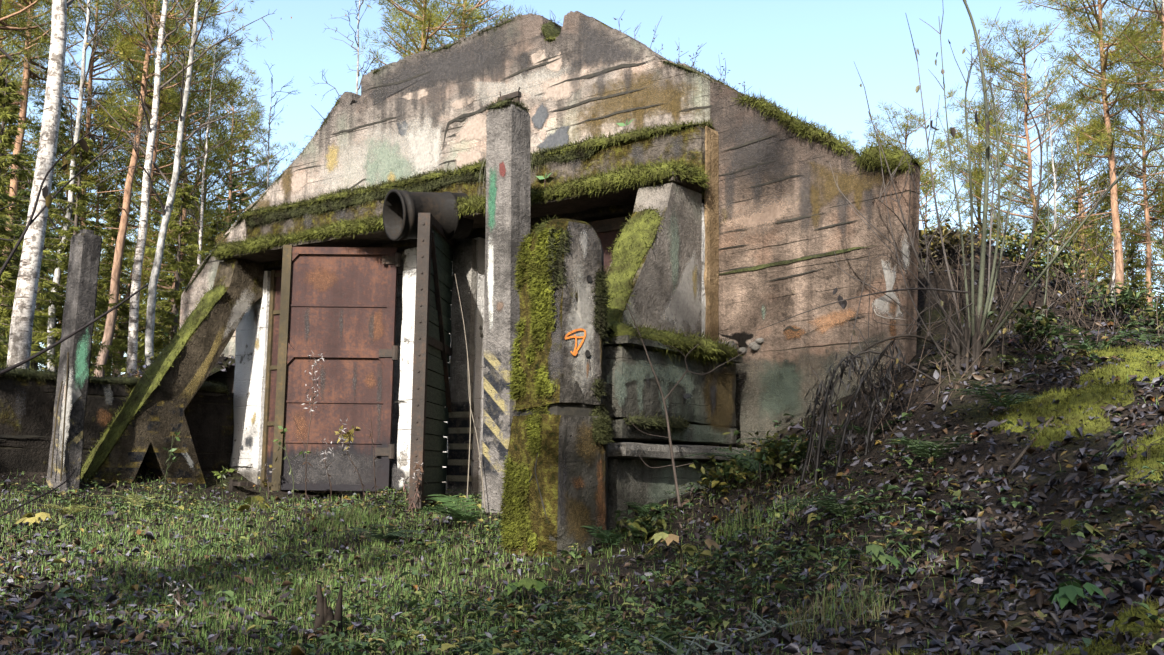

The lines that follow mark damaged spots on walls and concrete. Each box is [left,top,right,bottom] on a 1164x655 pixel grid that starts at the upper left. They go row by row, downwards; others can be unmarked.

leakage [364,33,552,104]
leakage [576,21,638,66]
leakage [670,95,680,123]
leakage [322,126,440,188]
corrosion [598,463,606,527]